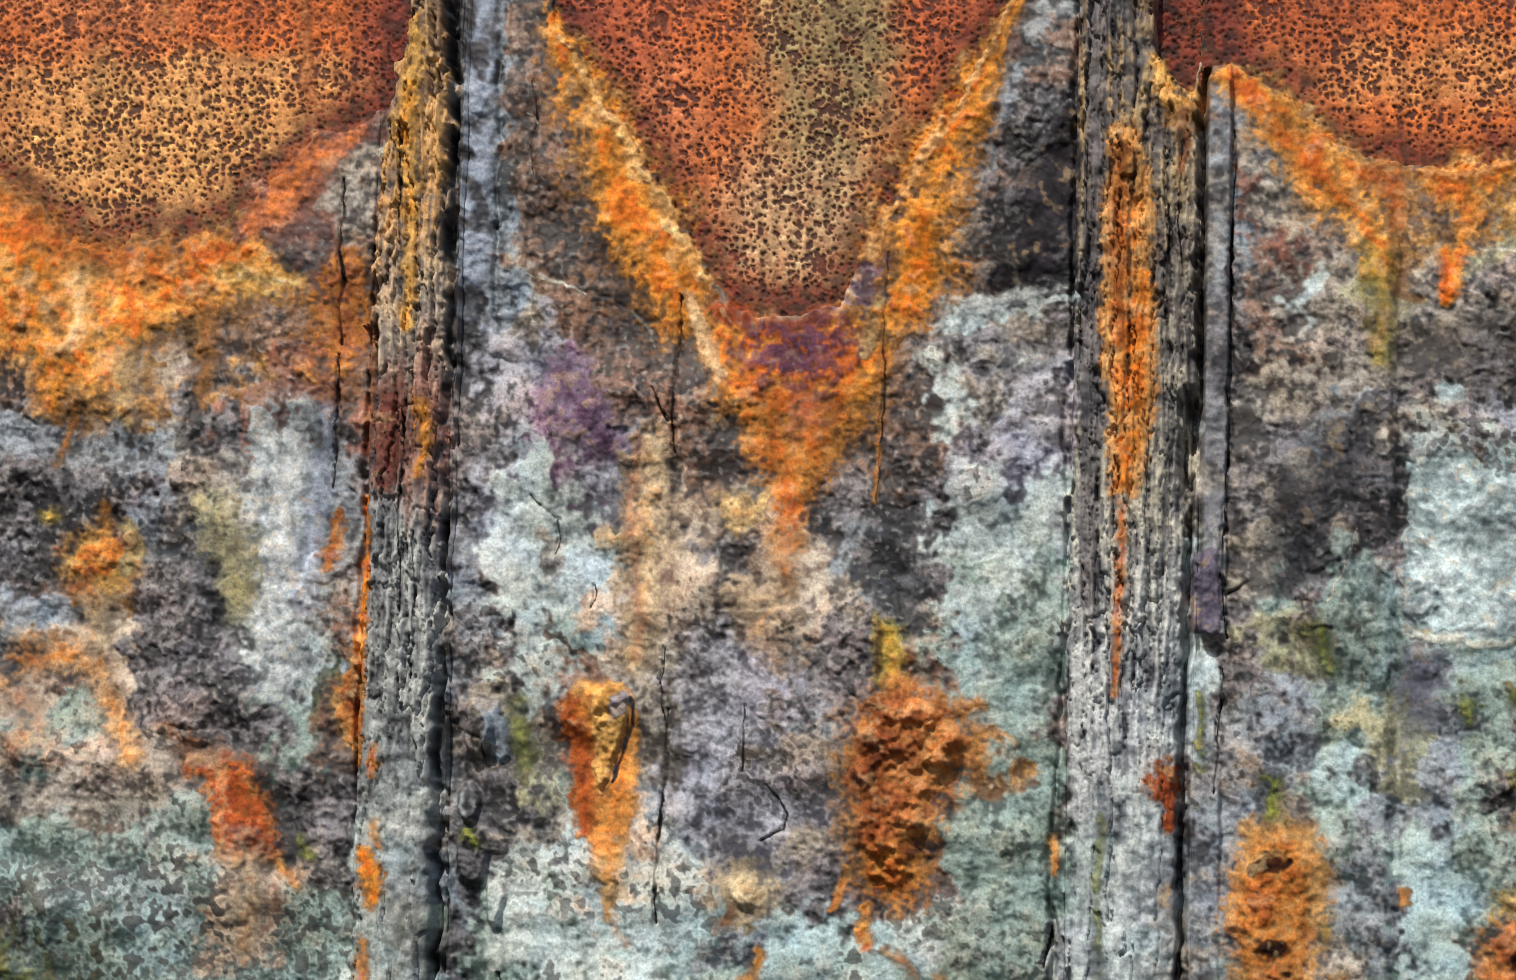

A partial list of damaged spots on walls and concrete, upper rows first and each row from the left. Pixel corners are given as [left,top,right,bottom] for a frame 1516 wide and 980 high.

corrosion [0,121,433,778]
corrosion [295,0,316,108]
corrosion [391,12,427,332]
corrosion [531,0,1025,648]
corrosion [1097,122,1161,697]
corrosion [1150,53,1516,364]
corrosion [168,732,297,964]
corrosion [354,938,369,980]
corrosion [355,818,388,911]